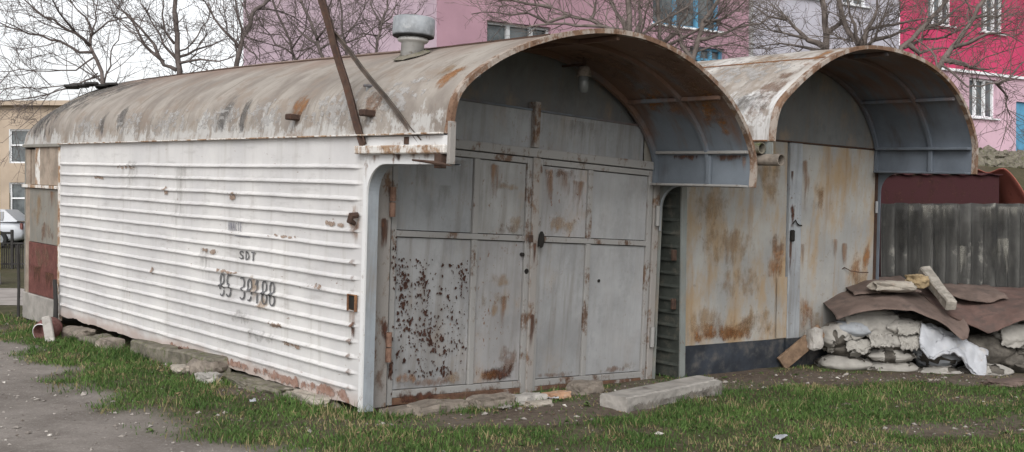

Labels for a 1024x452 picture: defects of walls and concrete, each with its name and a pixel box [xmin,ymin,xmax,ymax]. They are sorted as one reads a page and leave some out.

leakage [30,79,147,134]
leakage [219,102,251,130]
rust [438,28,757,188]
rust [836,244,870,277]
rust [769,237,792,338]
rust [695,325,748,341]
rust [377,361,449,403]
rust [466,352,515,394]